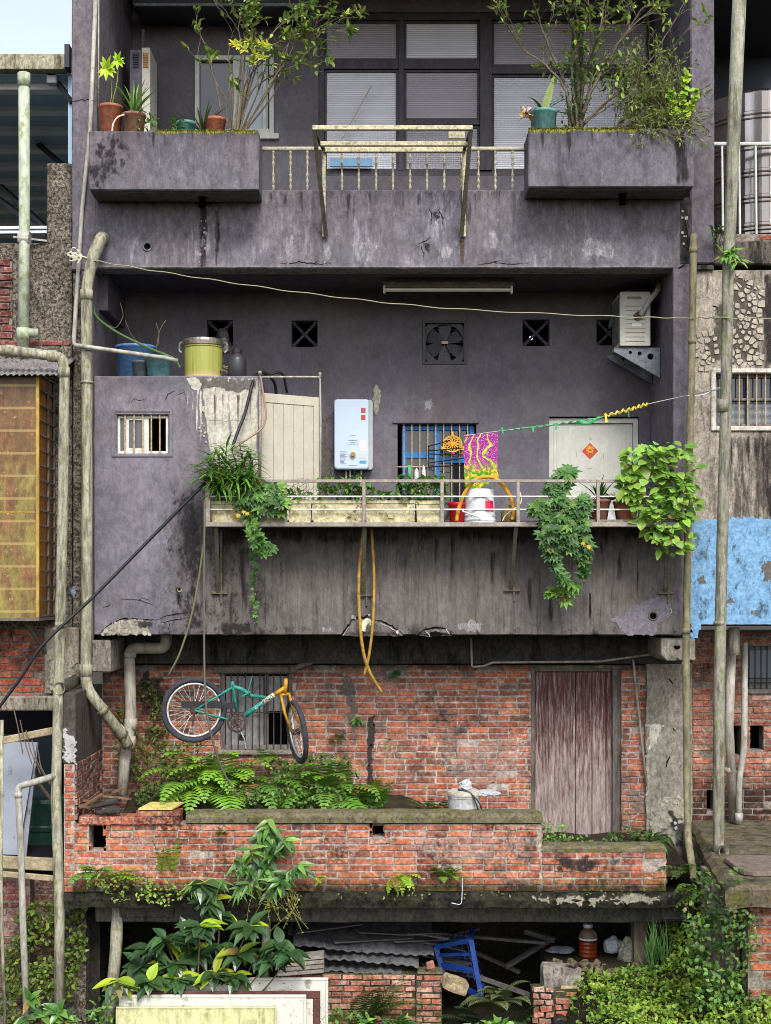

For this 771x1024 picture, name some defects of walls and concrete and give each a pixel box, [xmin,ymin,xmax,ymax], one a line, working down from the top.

leakage [89,138,130,187]
leakage [199,202,220,267]
peeling [186,376,258,478]
leakage [219,531,257,635]
peeling [761,561,771,582]
spalling [99,613,184,636]
peeling [610,597,672,636]
peeling [62,728,77,765]